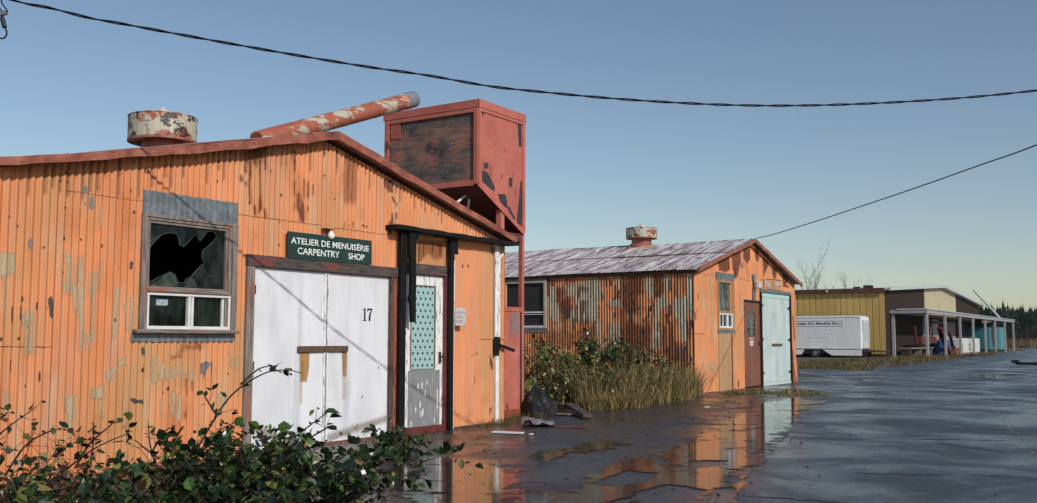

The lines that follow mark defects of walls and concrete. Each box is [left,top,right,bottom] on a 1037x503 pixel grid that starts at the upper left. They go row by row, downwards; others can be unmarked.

rust [294,178,314,223]
rust [375,164,397,234]
peeling [0,252,101,353]
peeling [113,288,134,338]
rust [542,278,595,344]
peeling [547,273,713,372]
rust [621,274,686,371]
peeling [91,355,126,417]
peeling [141,347,228,420]